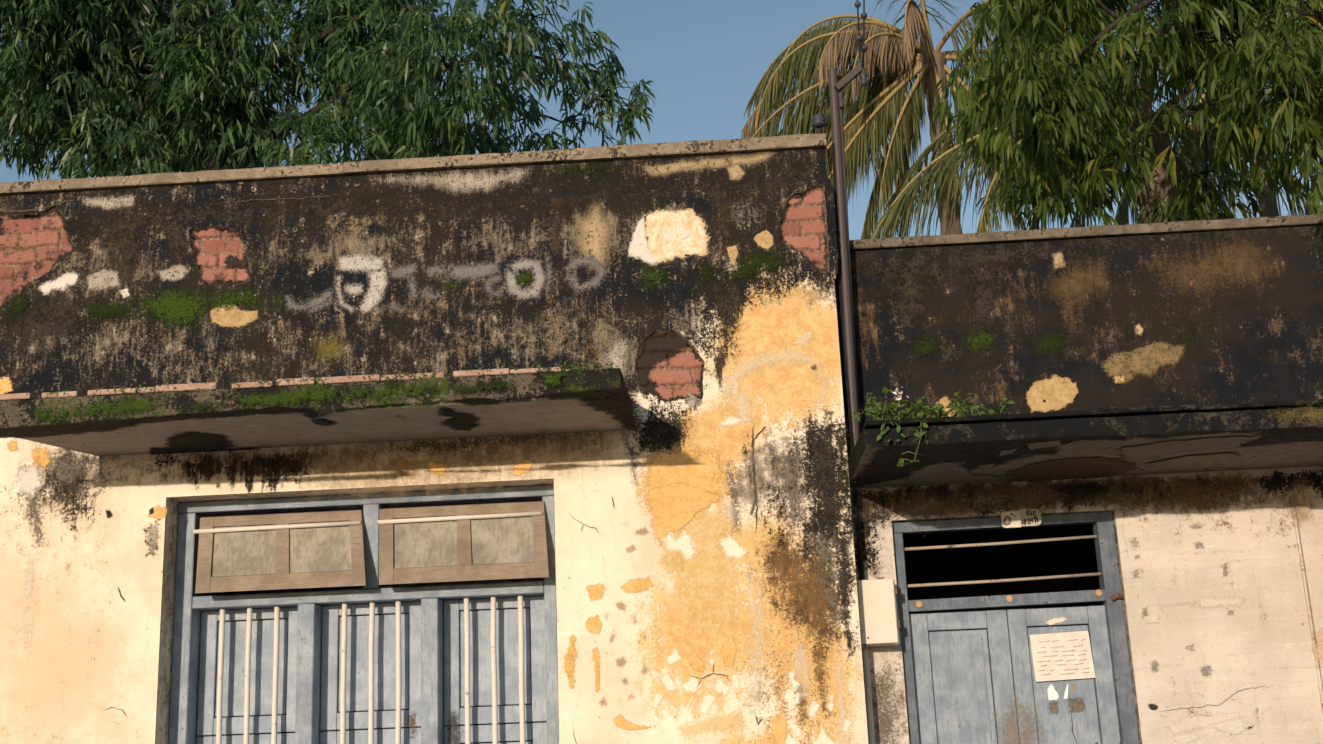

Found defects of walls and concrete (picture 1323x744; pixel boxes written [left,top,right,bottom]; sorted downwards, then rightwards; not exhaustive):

spalling [0,199,130,320]
spalling [156,220,258,328]
flaking render [369,165,535,199]
flaking render [572,199,710,274]
spalling [754,178,838,279]
spalling [578,324,829,430]
flaking render [1026,374,1078,413]
water stain [0,387,632,648]
peeling [627,441,728,559]
water stain [724,460,743,536]
water stain [745,405,1143,744]
peeling [562,577,654,704]